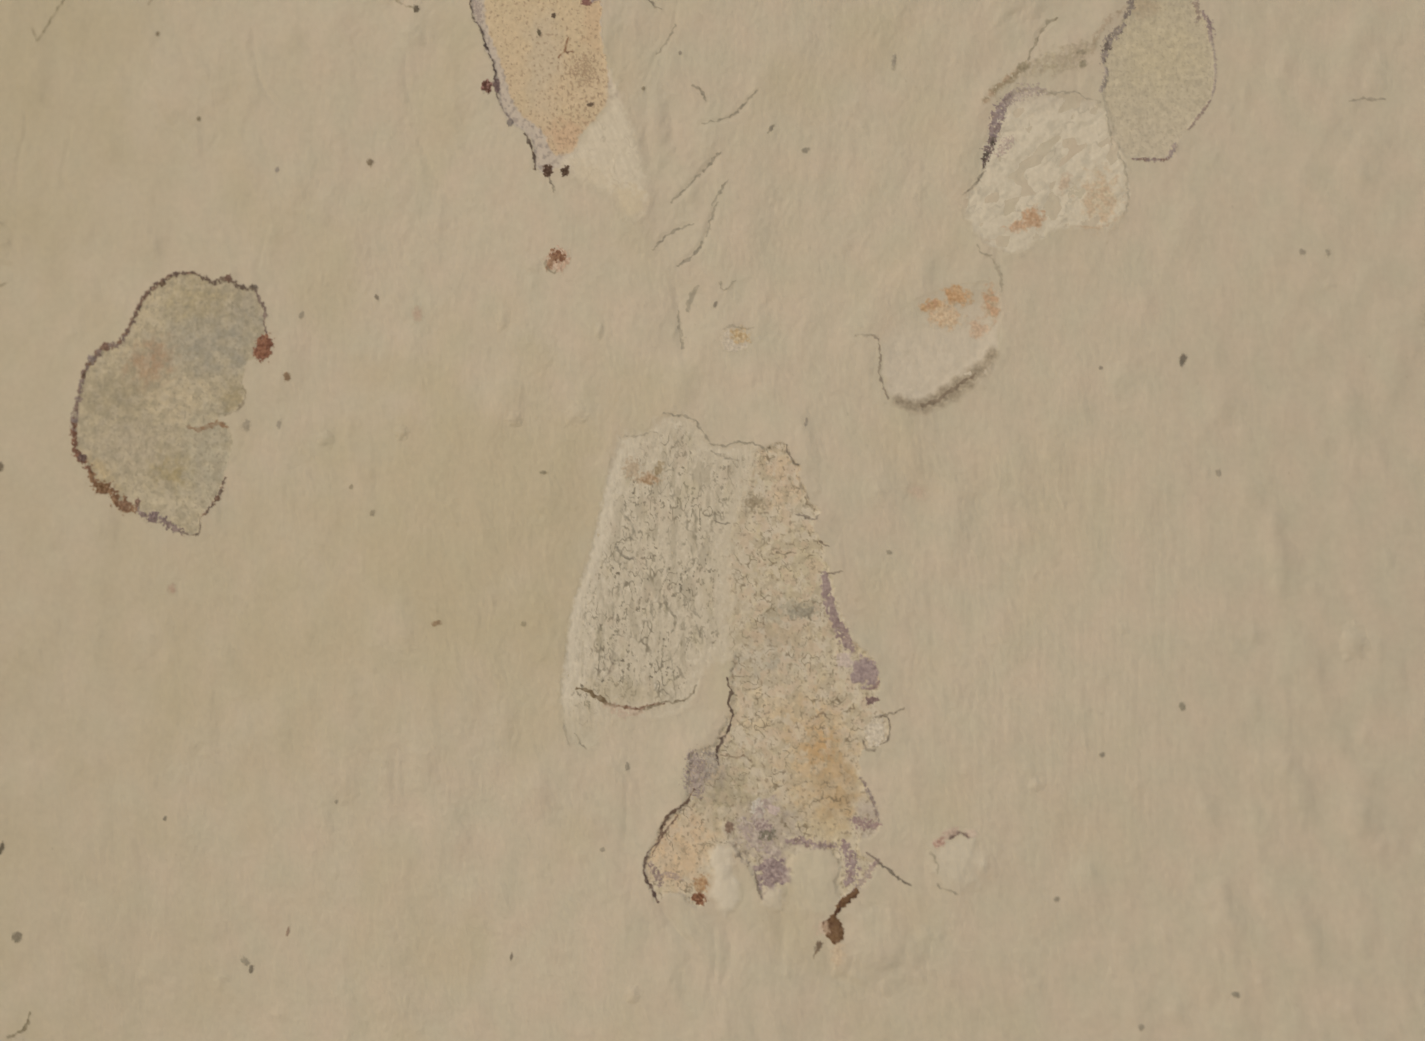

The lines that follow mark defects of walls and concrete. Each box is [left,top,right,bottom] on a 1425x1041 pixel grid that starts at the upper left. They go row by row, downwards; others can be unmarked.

peeling [469,0,655,225]
peeling [68,270,276,537]
peeling [557,404,905,922]